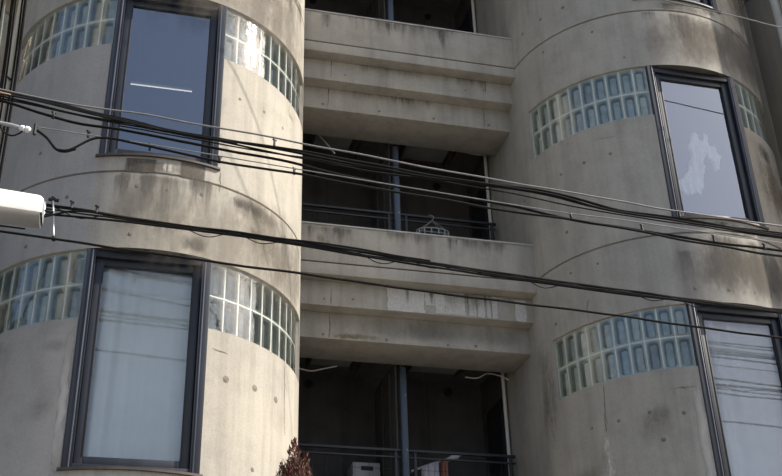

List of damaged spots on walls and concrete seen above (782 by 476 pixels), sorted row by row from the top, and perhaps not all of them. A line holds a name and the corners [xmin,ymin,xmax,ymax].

damp [121,158,209,187]
damp [239,203,272,223]
peeling [386,287,498,319]
peeling [514,300,527,322]